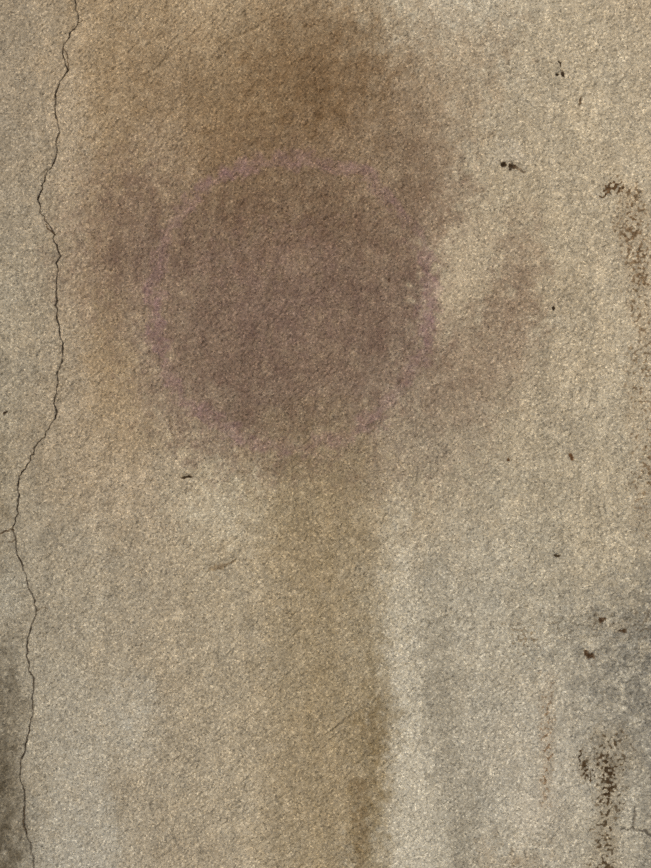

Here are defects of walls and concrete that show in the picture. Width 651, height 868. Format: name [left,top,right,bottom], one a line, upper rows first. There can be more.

water stain [48,0,238,247]
crack [0,0,83,866]
water stain [0,430,179,868]
water stain [66,318,561,868]
water stain [501,175,651,868]